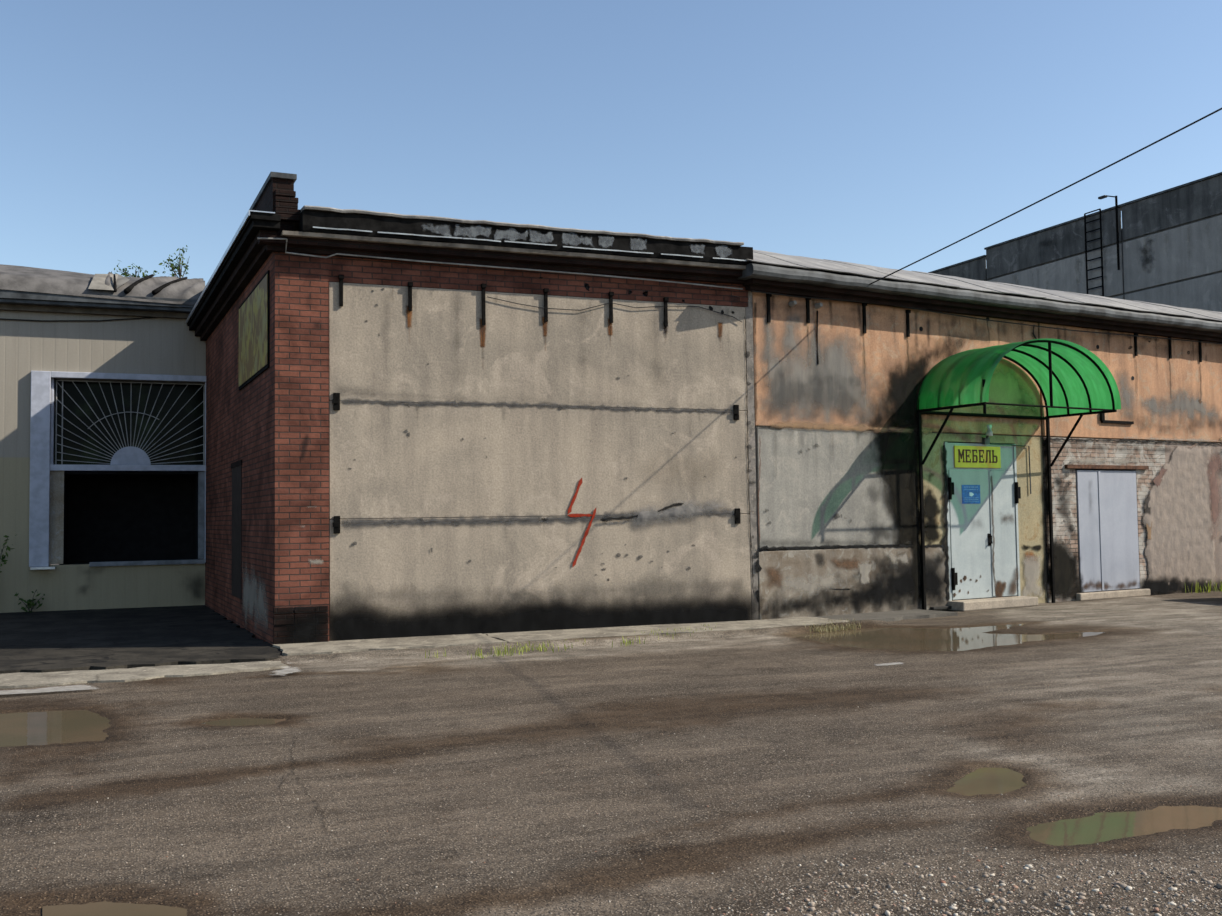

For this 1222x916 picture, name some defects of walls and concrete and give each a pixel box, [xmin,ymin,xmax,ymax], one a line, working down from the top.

damp [286,343,962,643]
flaking render [1143,437,1222,593]